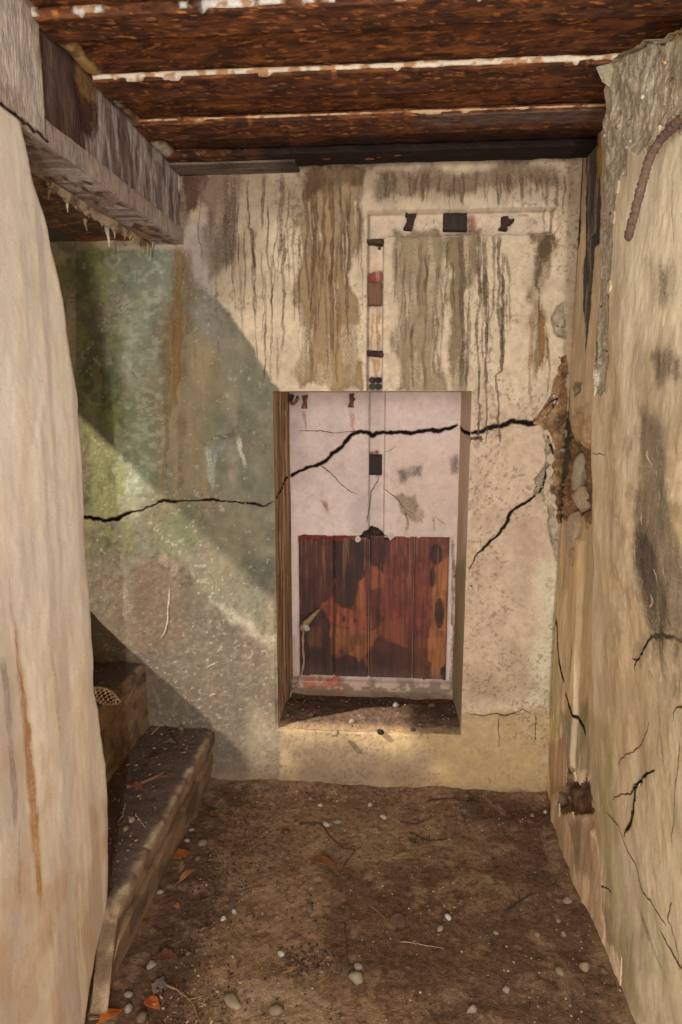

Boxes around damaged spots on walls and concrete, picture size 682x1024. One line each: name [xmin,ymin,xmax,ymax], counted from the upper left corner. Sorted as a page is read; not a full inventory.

leakage [178,165,366,391]
leakage [391,229,508,441]
leakage [377,160,566,240]
spalling [531,33,682,567]
corrosion [624,111,682,241]
crack [84,398,558,571]
crack [632,633,681,672]
spalling [556,766,595,818]
crack [608,706,682,969]